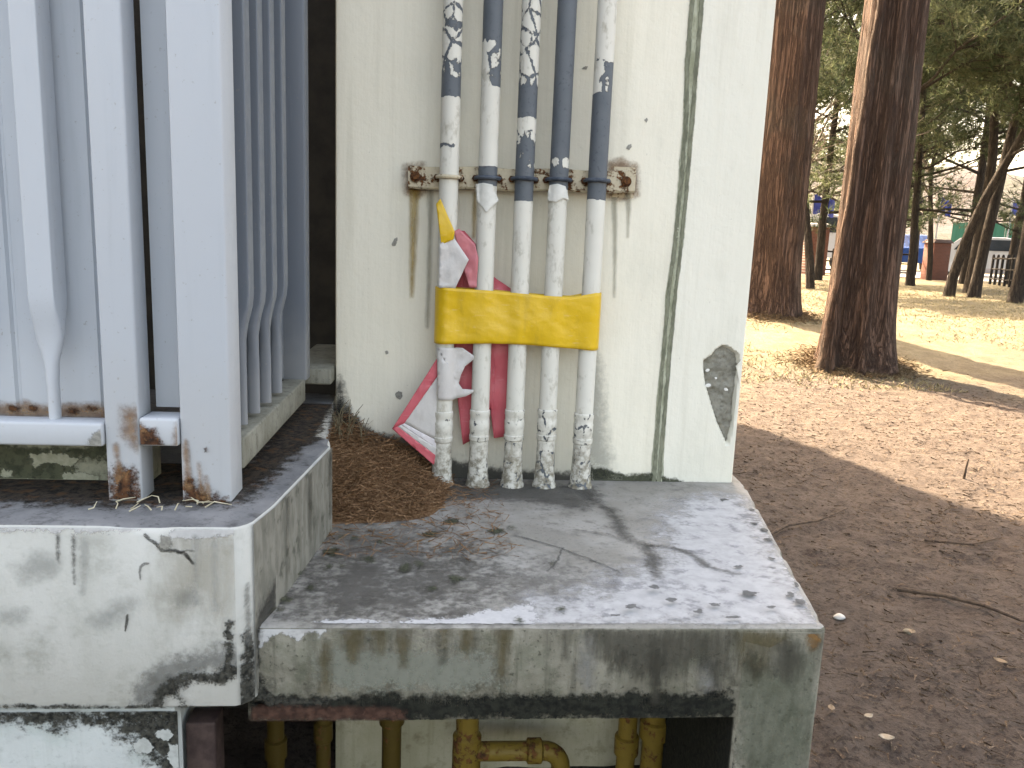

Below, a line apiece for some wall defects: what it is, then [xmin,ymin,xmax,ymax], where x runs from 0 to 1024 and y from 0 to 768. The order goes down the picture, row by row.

corrosion [608,162,637,199]
corrosion [406,165,423,293]
corrosion [0,402,105,418]
spalling [703,346,737,441]
corrosion [107,445,141,500]
corrosion [123,410,227,503]
crack [139,534,194,580]
damp [134,448,332,709]
crack [514,535,620,573]
damp [343,630,408,661]
damp [498,630,511,674]
damp [584,630,787,701]